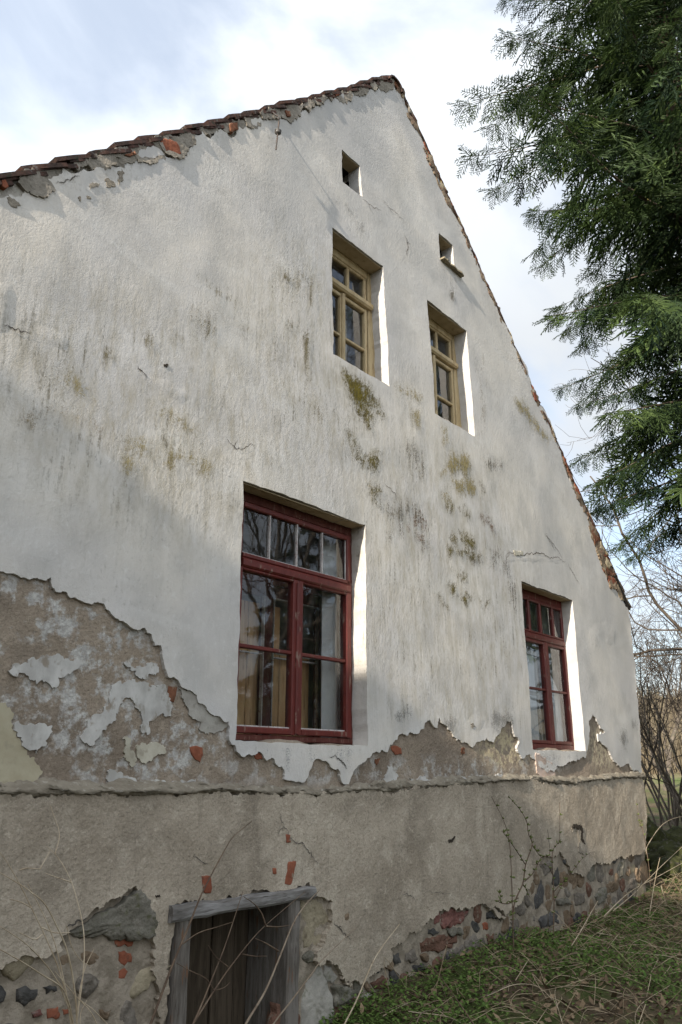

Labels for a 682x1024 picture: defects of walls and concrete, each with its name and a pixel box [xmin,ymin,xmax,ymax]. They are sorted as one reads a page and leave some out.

spalling [0,180,21,208]
spalling [78,170,125,201]
damp [364,395,385,429]
crack [505,536,578,581]
peeling [7,653,80,688]
peeling [13,721,53,754]
peeling [79,662,177,782]
flaking render [189,746,203,762]
peeling [374,745,429,782]